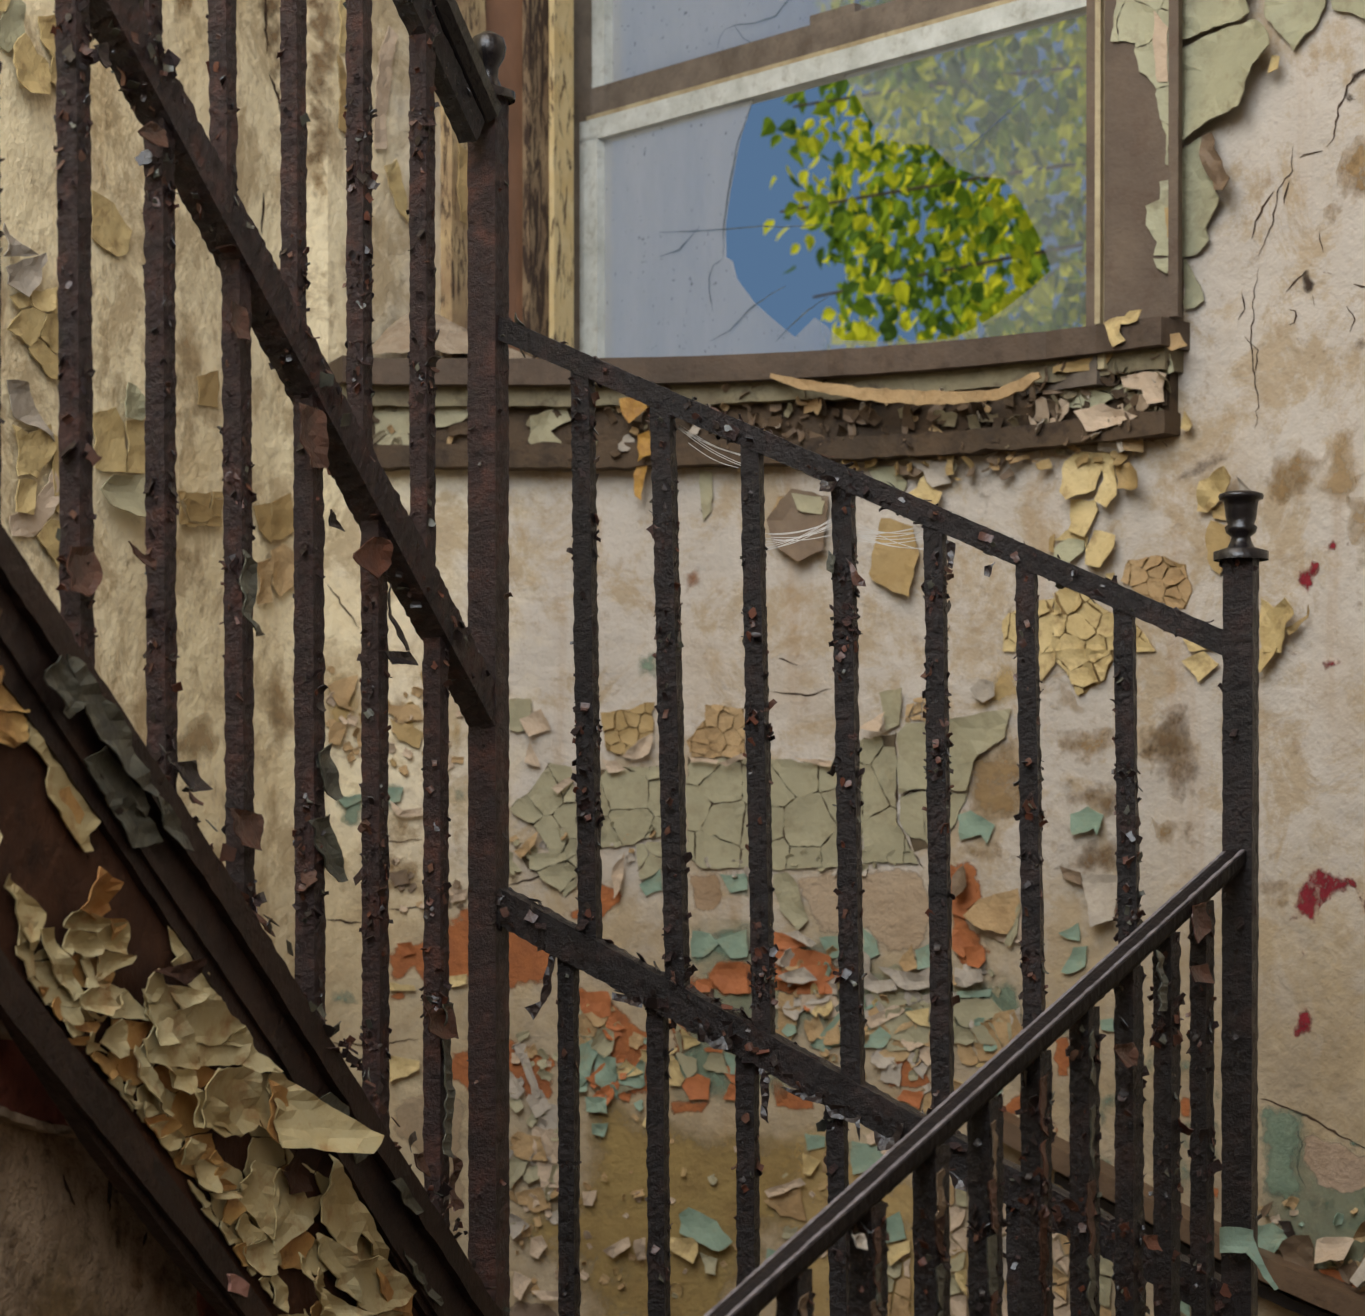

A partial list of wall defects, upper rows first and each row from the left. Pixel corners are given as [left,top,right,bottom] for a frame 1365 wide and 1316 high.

peeling [1111,0,1365,309]
crack [1238,69,1365,427]
peeling [770,309,1142,406]
peeling [1048,333,1193,609]
peeling [1038,587,1114,696]
peeling [0,653,194,852]
peeling [600,702,662,898]
peeling [685,704,750,893]
peeling [860,688,928,877]
peeling [770,757,841,1063]
peeling [0,858,444,1316]
peeling [863,928,932,1113]